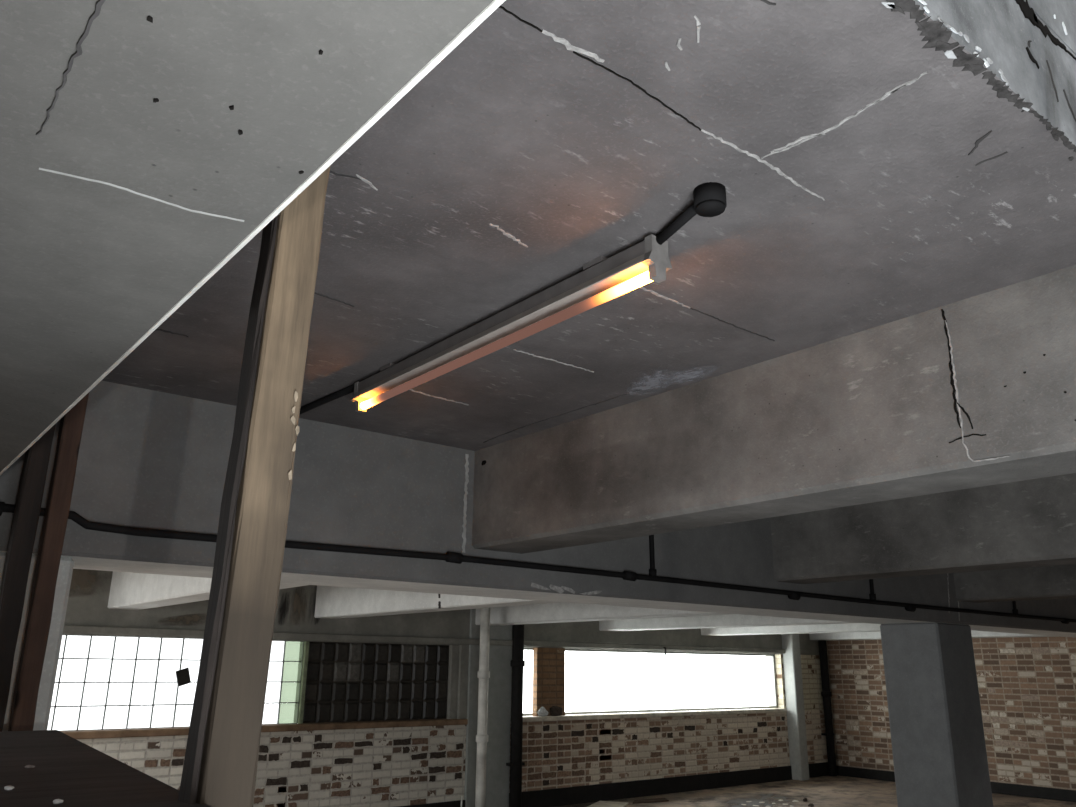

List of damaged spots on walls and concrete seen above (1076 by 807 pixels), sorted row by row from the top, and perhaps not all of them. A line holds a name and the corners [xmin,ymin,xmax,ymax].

crack [39,168,244,222]
crack [498,6,928,201]
spalling [881,0,1076,161]
crack [968,130,1007,166]
crack [1015,0,1076,122]
crack [941,309,1010,462]